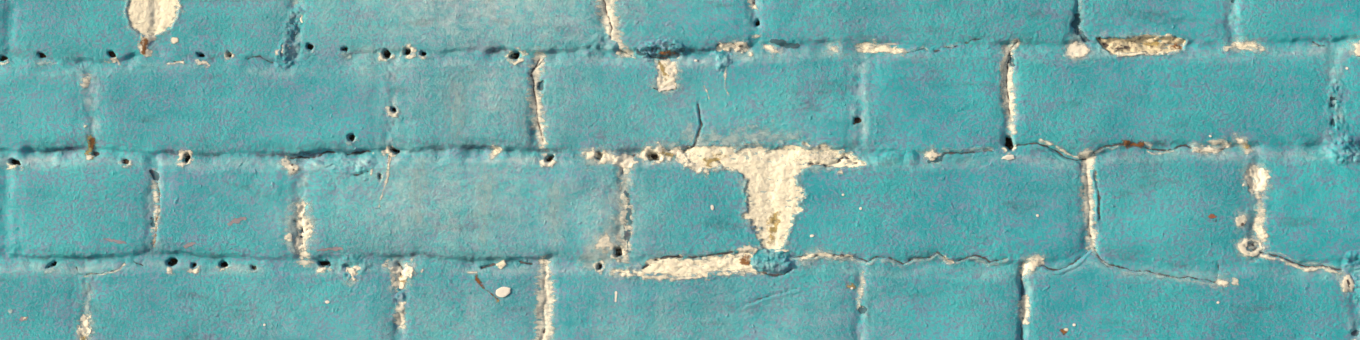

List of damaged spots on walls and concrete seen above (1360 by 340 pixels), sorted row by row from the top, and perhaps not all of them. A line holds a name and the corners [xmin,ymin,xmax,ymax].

peeling [127,0,181,57]
spalling [1065,14,1186,60]
crack [907,39,1219,283]
peeling [581,131,865,282]
peeling [284,201,413,329]
spalling [847,277,867,314]
crack [740,252,1007,312]